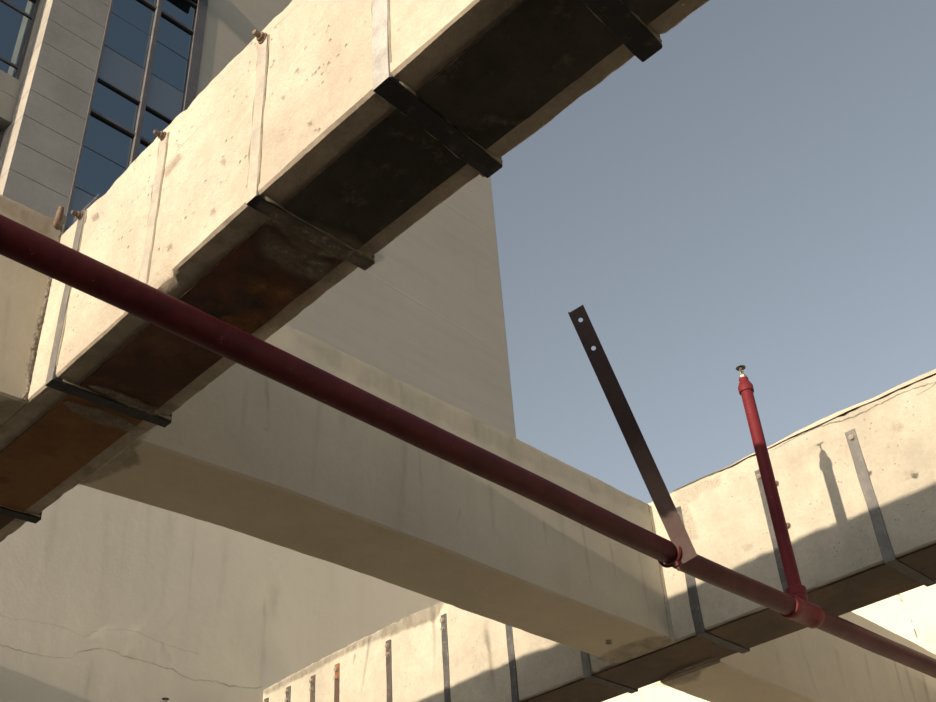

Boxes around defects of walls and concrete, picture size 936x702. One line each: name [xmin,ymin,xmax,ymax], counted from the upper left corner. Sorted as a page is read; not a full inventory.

spalling [53,206,66,243]
spalling [20,276,52,400]
crack [779,384,935,447]